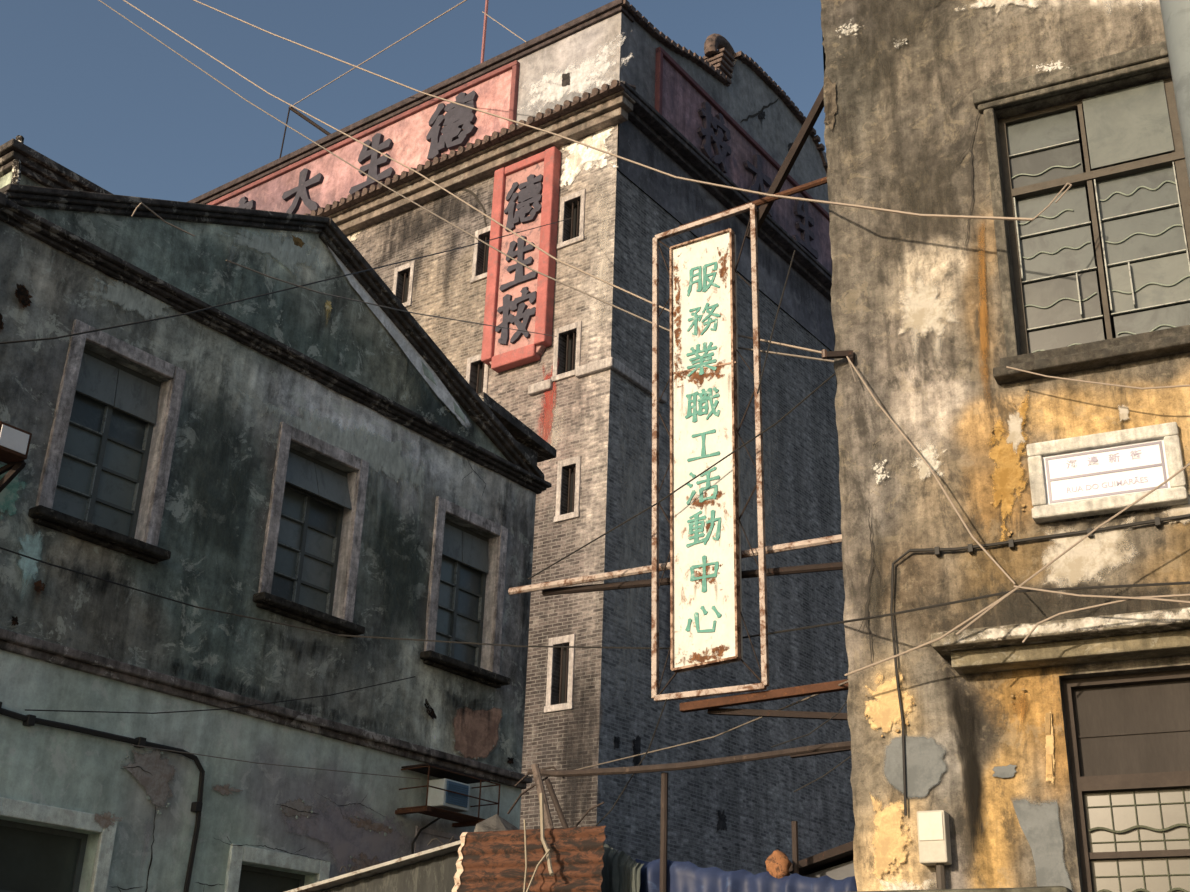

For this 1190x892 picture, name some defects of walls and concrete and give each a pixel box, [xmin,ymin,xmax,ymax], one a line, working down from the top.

corrosion [717,243,729,287]
corrosion [673,261,731,389]
leakage [261,404,425,487]
peeling [988,391,1029,542]
corrosion [679,645,729,664]
spalling [453,706,503,760]
peeling [865,673,914,737]
peeling [349,853,385,872]
peeling [871,796,929,891]